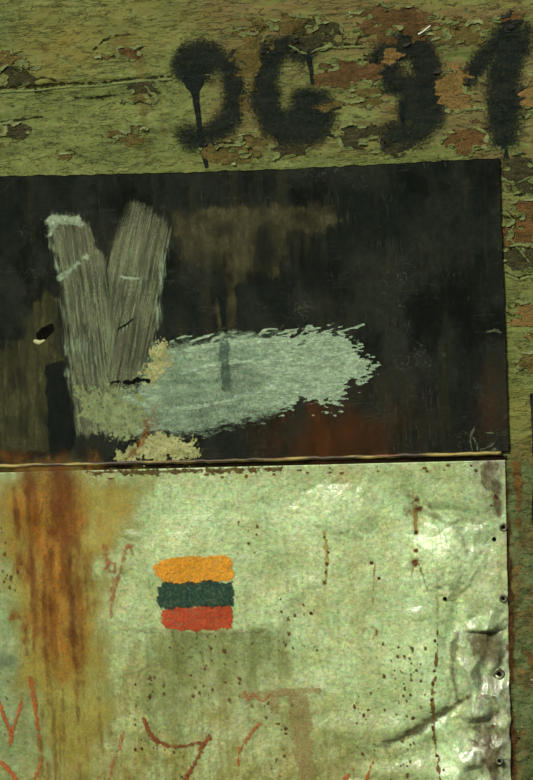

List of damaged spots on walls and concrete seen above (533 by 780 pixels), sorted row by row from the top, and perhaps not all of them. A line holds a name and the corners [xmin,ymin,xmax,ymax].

peeling [0,49,42,90]
peeling [94,44,144,62]
peeling [121,75,168,105]
peeling [229,0,530,116]
peeling [0,120,32,139]
peeling [106,122,149,149]
peeling [196,134,308,165]
peeling [327,122,412,158]
peeling [505,297,533,339]
corrosion [0,466,283,778]
corrosion [451,633,459,701]
corrosion [382,630,444,780]